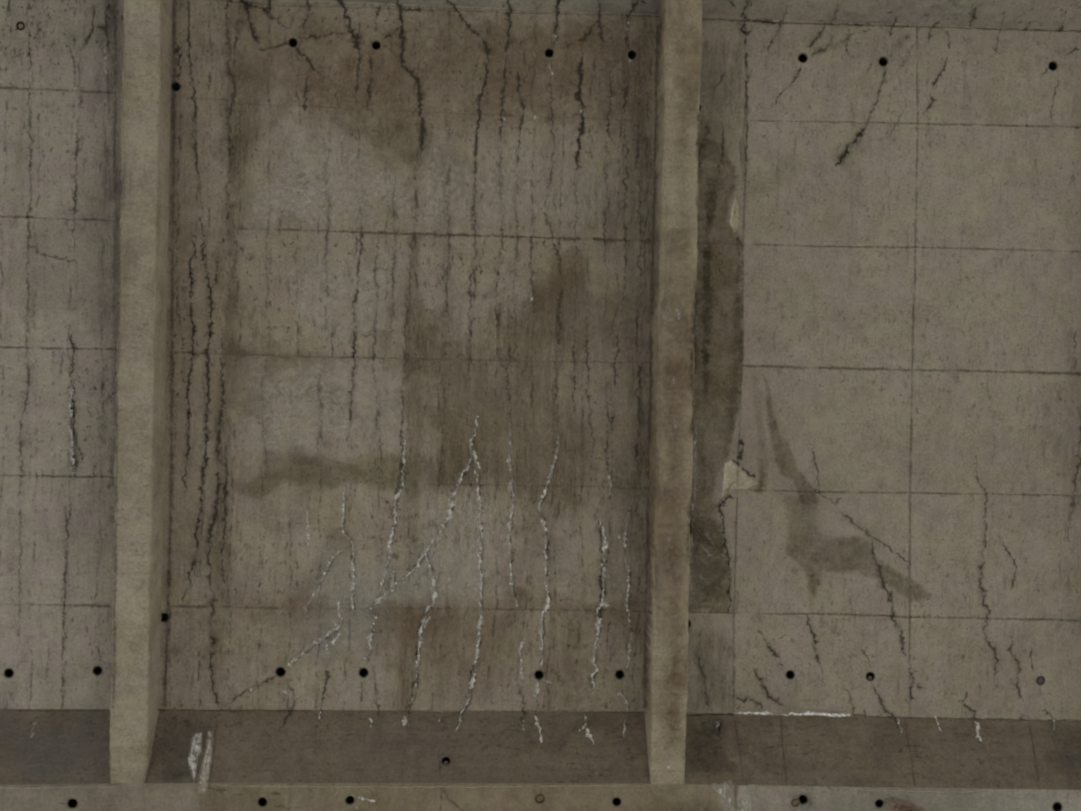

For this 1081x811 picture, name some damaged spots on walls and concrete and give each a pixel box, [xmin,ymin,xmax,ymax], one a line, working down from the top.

crack [775,10,903,167]
leakage [177,735,211,791]
crack [177,14,295,729]
leakage [247,434,437,700]
crack [225,0,646,519]
leakage [425,323,581,730]
leakage [591,509,643,694]
leakage [689,134,742,612]
spalling [722,460,758,498]
crack [698,616,823,734]
crack [802,447,923,725]
crack [976,459,1054,721]